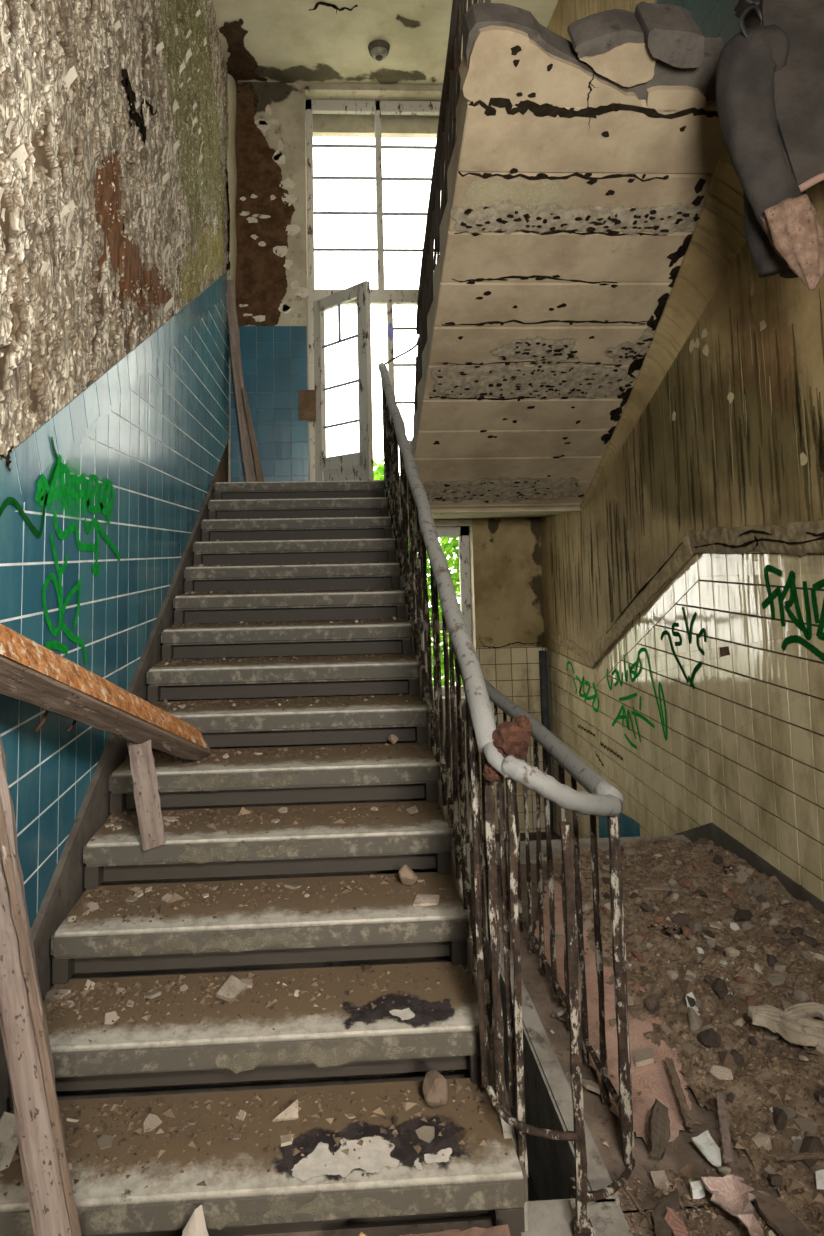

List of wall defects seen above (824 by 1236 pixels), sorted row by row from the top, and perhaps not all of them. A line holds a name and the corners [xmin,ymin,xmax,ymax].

crack [309,1,358,15]
spalling [511,45,522,67]
spalling [567,9,646,58]
crack [469,73,718,131]
crack [459,171,669,183]
peeling [0,0,309,459]
water stain [526,313,824,649]
peeling [0,624,207,748]
peeling [390,1008,415,1020]
peeling [207,1135,402,1230]
peeling [414,1148,452,1171]